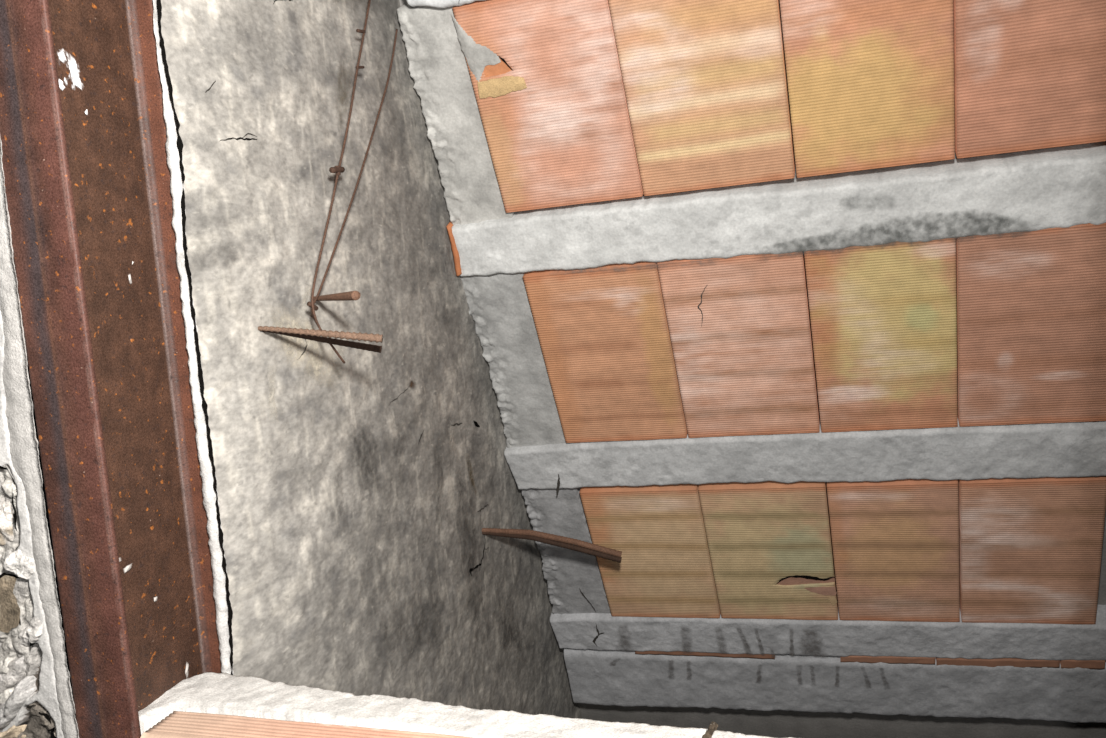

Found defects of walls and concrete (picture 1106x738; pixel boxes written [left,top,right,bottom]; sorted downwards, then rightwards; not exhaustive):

spalling [484,56,512,77]
leakage [797,235,850,253]
leakage [867,222,956,245]
leakage [967,214,1010,235]
spalling [0,464,56,738]
spalling [775,575,837,606]
crack [702,722,718,738]